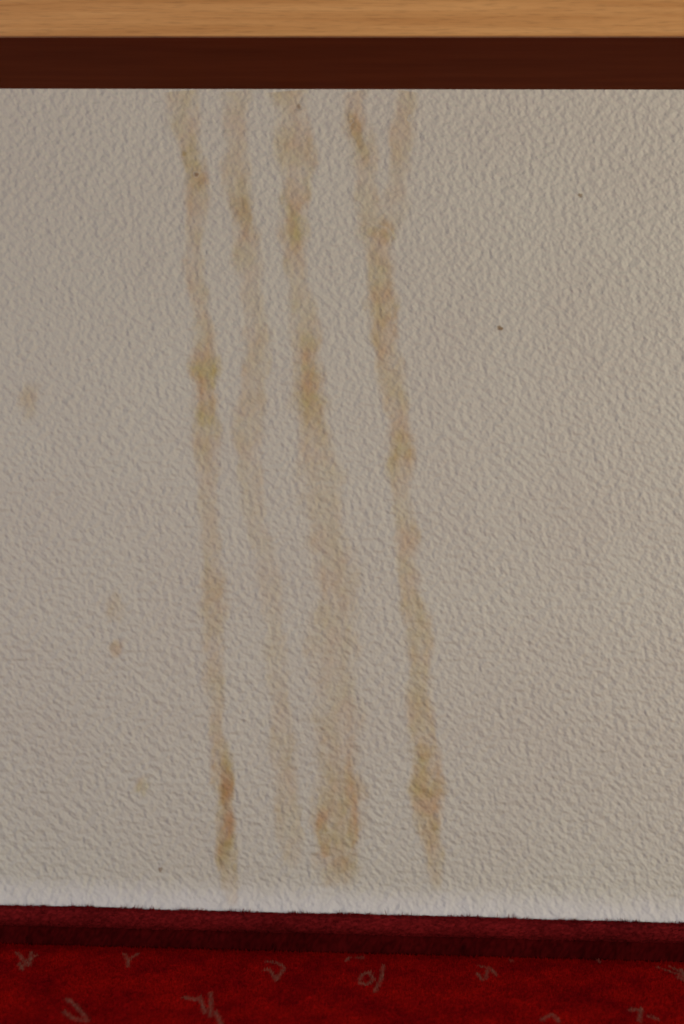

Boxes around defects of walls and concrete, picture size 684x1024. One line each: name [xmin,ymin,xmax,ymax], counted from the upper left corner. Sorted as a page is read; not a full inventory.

water stain [159,90,377,910]
water stain [337,90,453,894]